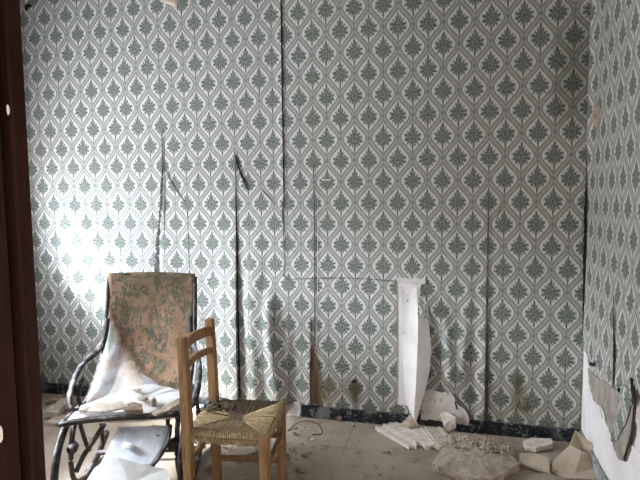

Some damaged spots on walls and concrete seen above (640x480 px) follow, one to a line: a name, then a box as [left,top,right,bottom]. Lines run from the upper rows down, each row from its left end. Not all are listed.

flaking render [585,359,640,480]